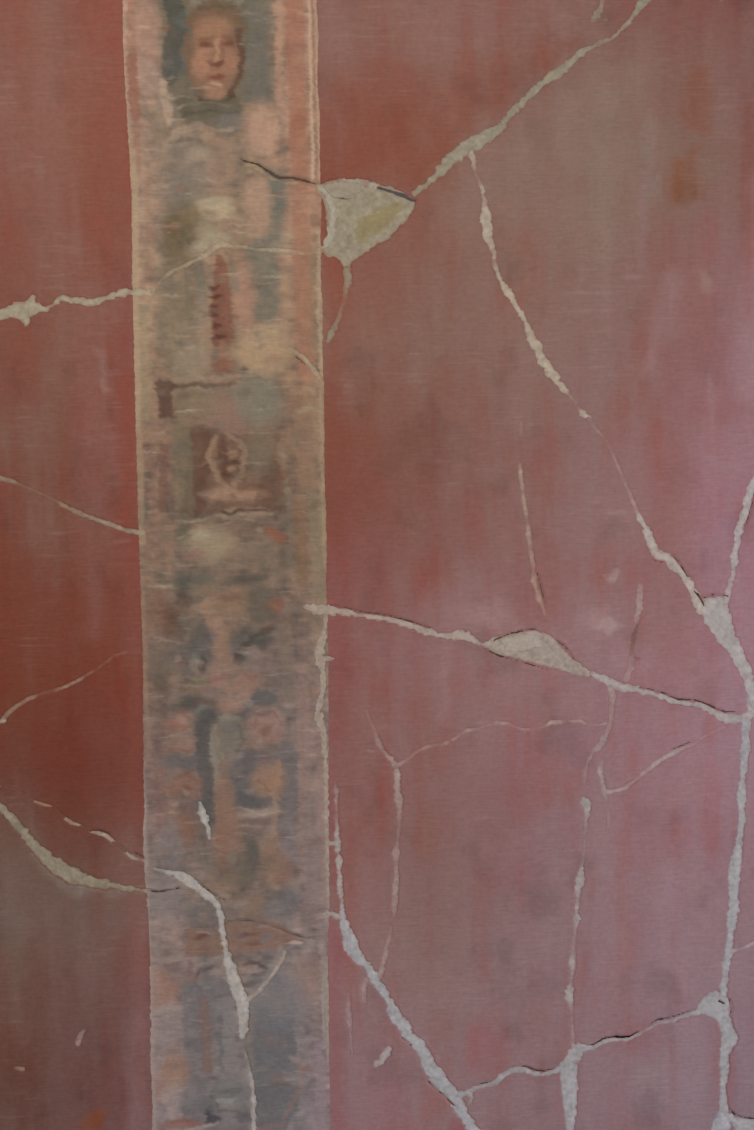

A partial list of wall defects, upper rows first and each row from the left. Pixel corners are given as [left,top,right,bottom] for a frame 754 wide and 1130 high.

flaking render [315,178,416,268]
crack [0,241,352,381]
crack [412,0,754,615]
crack [0,475,146,536]
crack [327,421,546,646]
crack [0,651,128,724]
flaking render [482,630,591,677]
crack [0,671,754,1130]